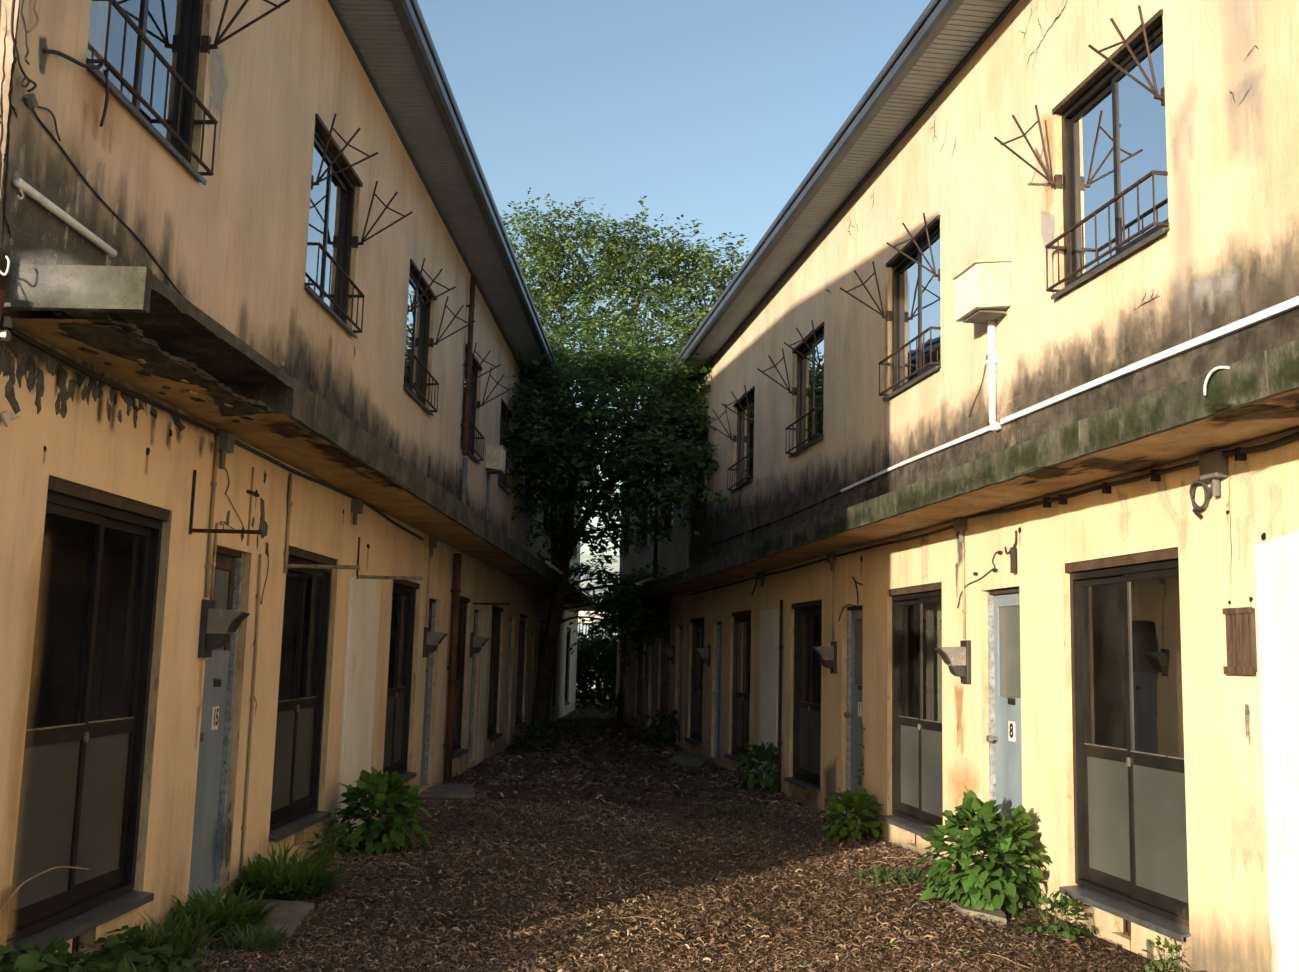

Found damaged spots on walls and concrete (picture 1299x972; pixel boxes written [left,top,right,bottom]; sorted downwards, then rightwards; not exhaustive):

damp [1042,212,1054,257]
damp [0,320,219,451]
spalling [0,324,265,437]
damp [267,338,506,535]
damp [689,268,1299,567]